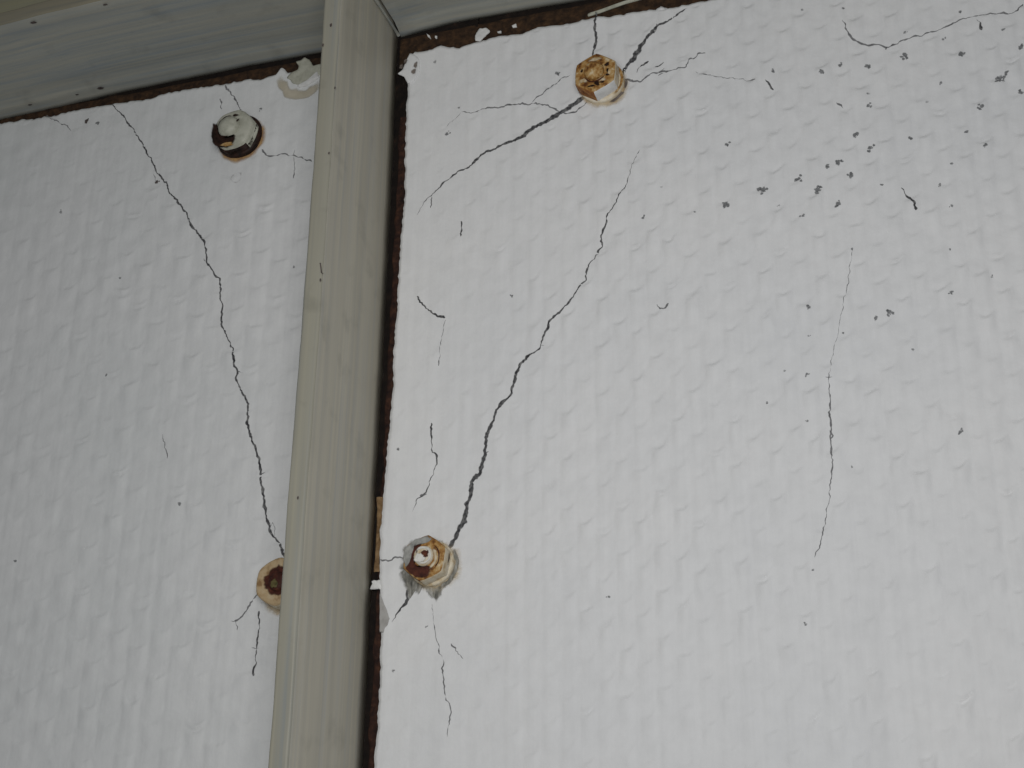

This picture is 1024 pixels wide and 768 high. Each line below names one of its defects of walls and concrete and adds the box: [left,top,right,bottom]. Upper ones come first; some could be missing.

peeling [287,57,321,88]
rust [581,62,627,106]
crack [622,8,774,90]
crack [842,4,1023,49]
rust [211,114,264,162]
crack [418,75,587,213]
crack [112,103,284,557]
crack [449,152,639,548]
crack [815,250,853,555]
crack [414,423,438,507]
rust [264,565,283,614]
rust [406,545,459,588]